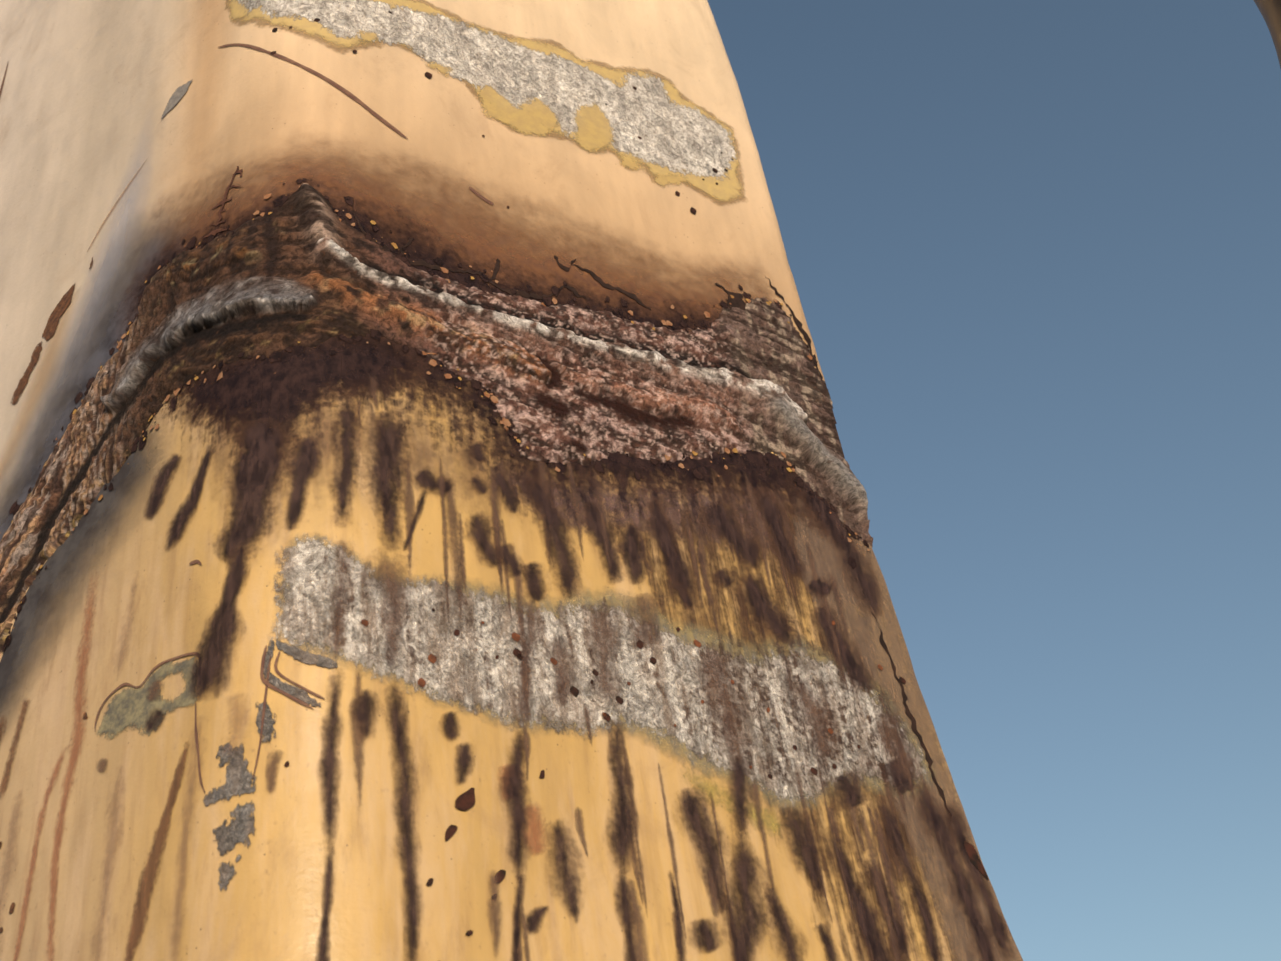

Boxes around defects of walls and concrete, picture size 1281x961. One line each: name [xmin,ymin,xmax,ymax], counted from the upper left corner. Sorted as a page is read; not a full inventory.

peeling [230,0,743,201]
water stain [0,157,804,541]
rust [14,605,91,961]
water stain [0,329,881,961]
peeling [83,537,930,891]
crack [871,612,951,814]